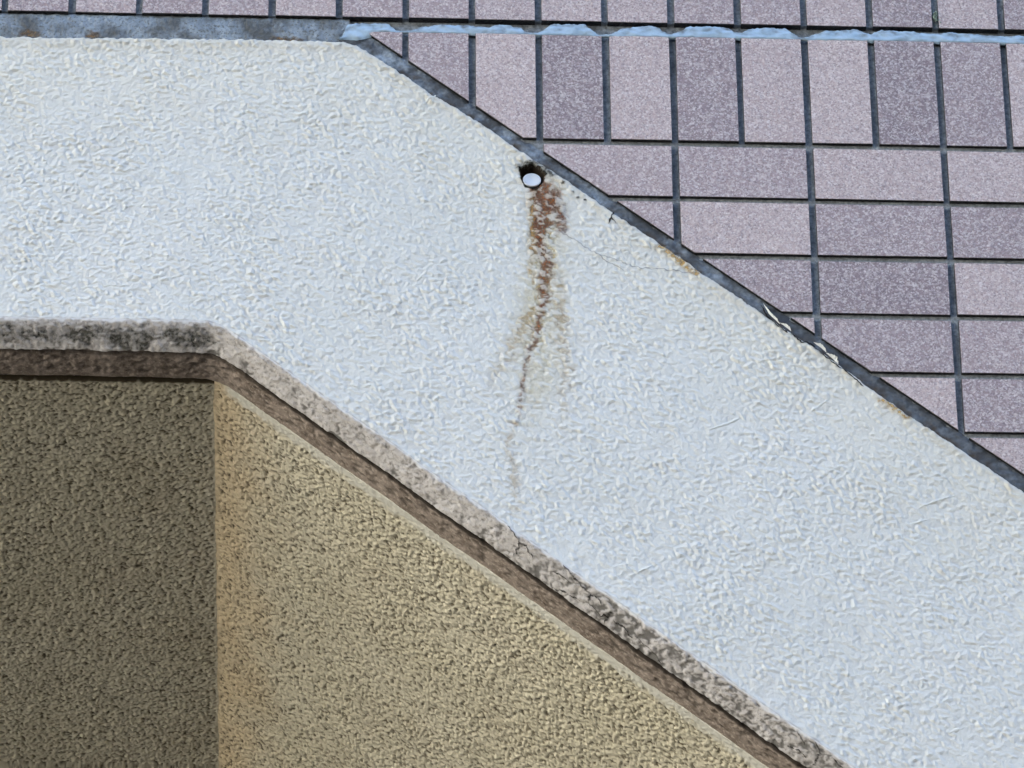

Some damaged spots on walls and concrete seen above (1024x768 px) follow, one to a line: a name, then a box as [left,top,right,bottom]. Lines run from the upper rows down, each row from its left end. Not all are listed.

corrosion [528,183,566,358]
crack [560,231,693,273]
crack [554,565,662,664]